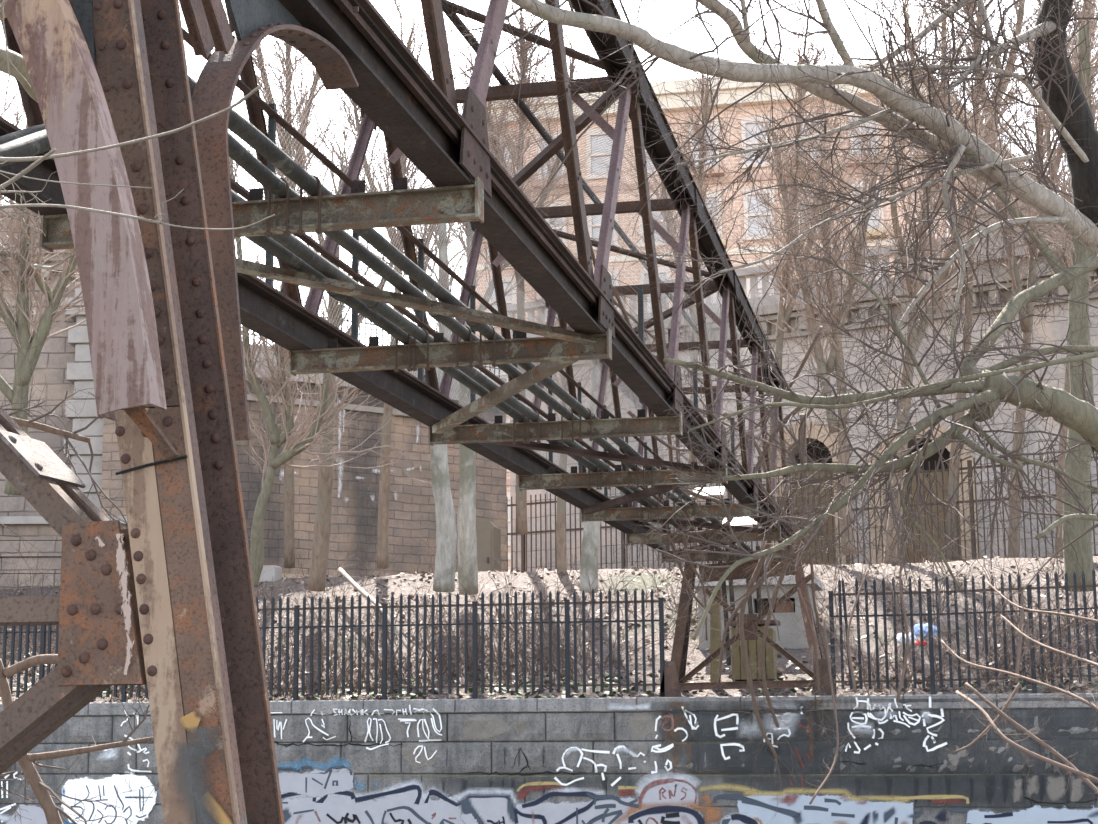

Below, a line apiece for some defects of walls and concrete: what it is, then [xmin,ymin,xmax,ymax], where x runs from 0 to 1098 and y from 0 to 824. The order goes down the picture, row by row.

peeling [95,533,134,675]